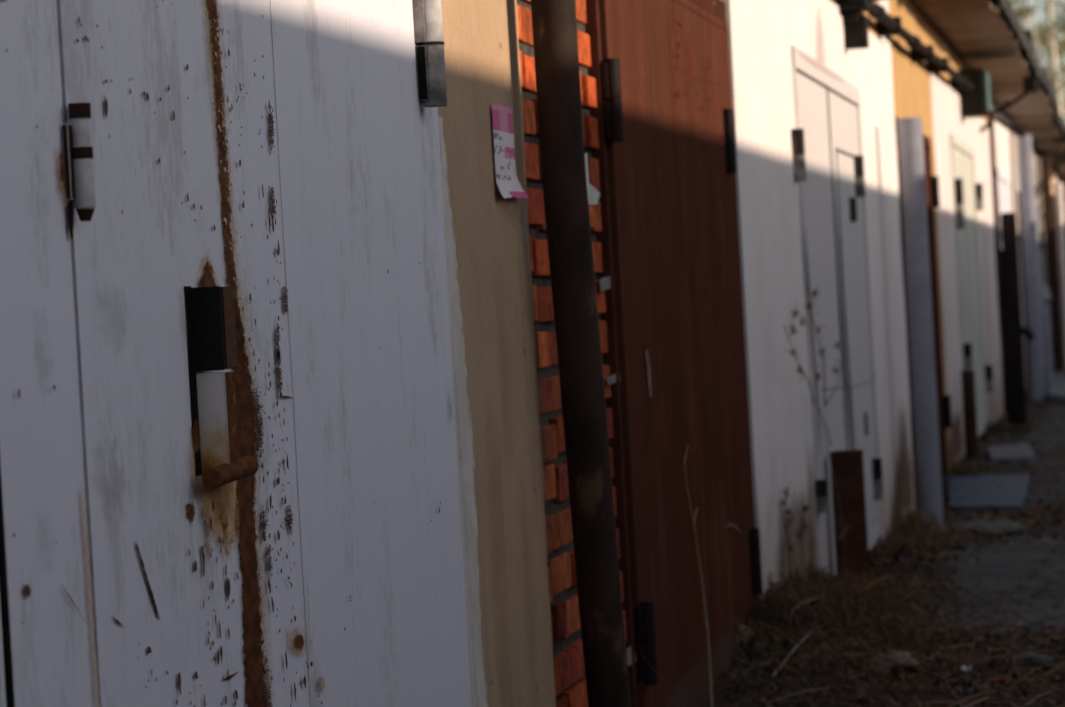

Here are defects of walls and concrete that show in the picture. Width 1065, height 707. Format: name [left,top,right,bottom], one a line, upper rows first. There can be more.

corrosion [58,150,74,240]
corrosion [268,3,298,480]
corrosion [187,0,274,707]
corrosion [286,493,302,553]
corrosion [289,566,324,707]